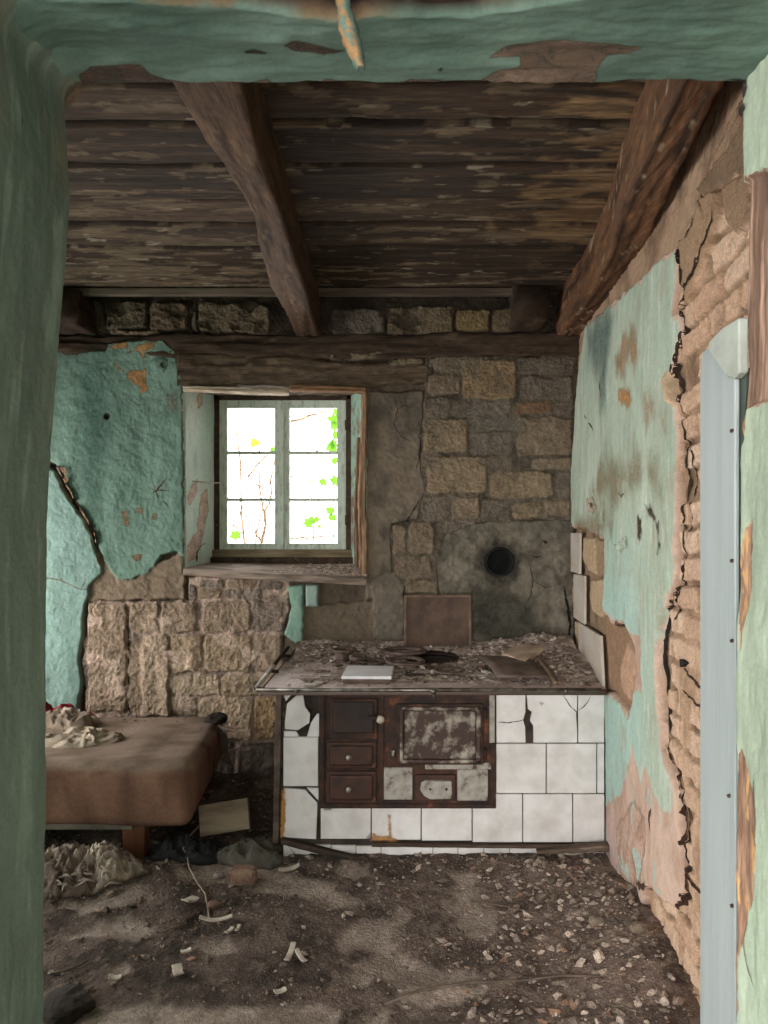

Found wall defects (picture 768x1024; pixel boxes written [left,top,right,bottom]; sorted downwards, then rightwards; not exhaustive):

spalling [482,40,642,84]
crack [46,433,103,590]
peeling [187,480,209,562]
crack [524,540,572,635]
crack [663,195,713,913]
flaking render [650,79,768,1014]
flaking render [82,576,292,774]